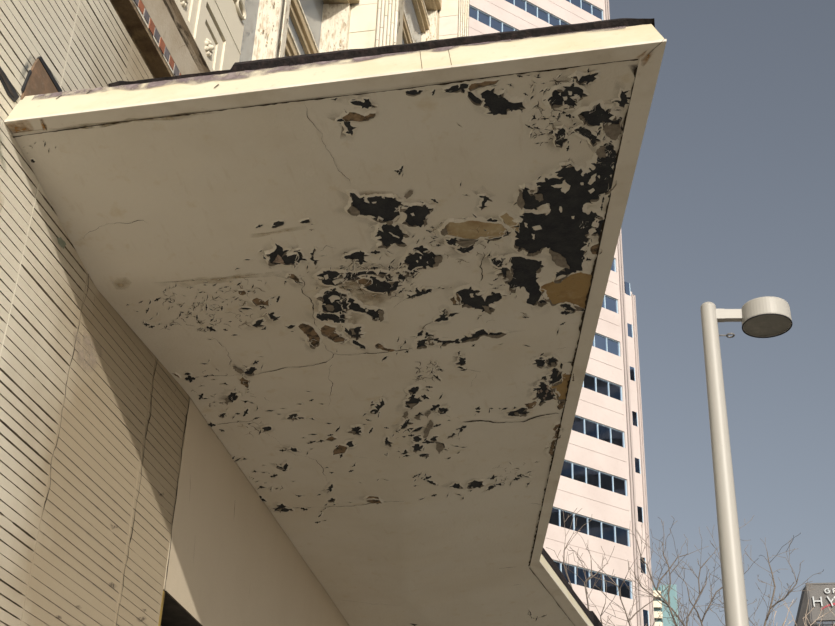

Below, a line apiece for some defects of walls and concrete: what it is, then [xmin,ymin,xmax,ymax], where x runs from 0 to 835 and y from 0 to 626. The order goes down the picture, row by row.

peeling [126,67,632,371]
peeling [171,356,469,459]
crack [13,43,661,626]
flaking render [474,351,575,417]
peeling [249,462,337,524]
peeling [411,461,540,500]